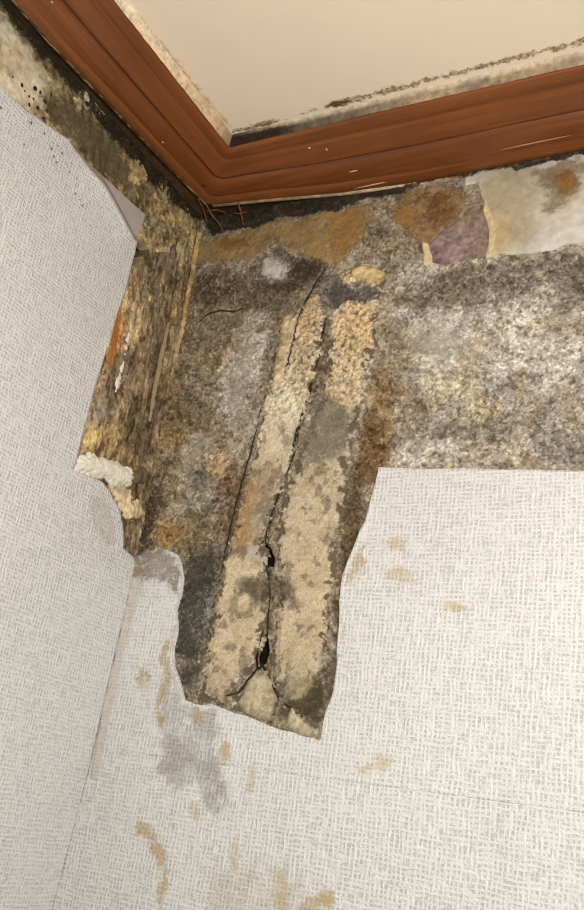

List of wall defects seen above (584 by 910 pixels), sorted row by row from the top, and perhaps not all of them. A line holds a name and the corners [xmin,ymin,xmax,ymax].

peeling [0,3,262,512]
crack [208,265,328,717]
water stain [0,0,584,235]
water stain [287,663,329,724]
peeling [121,177,584,740]